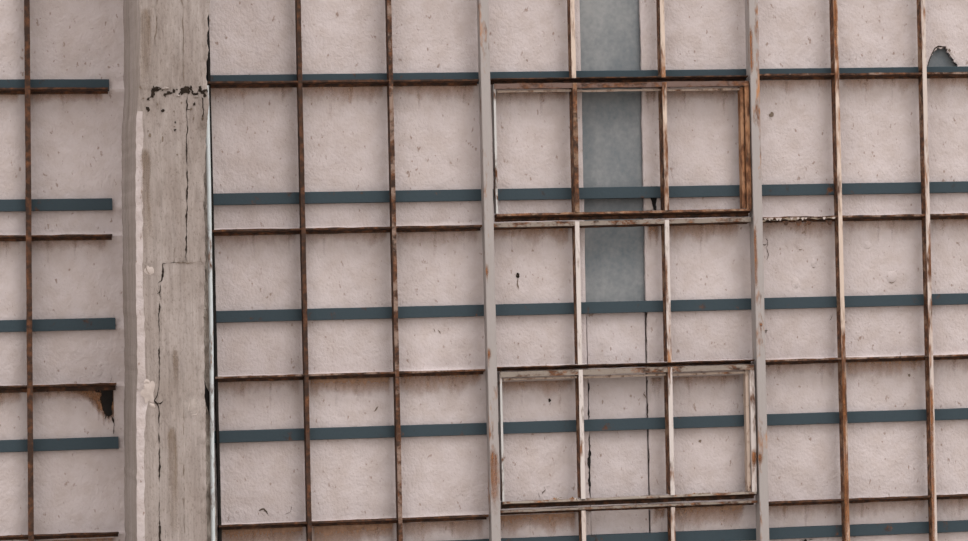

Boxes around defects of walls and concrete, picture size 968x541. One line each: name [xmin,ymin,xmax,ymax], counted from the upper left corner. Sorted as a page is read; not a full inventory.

spalling [139,86,208,131]
peeling [763,217,835,226]
crack [154,0,206,541]
crack [95,378,114,434]